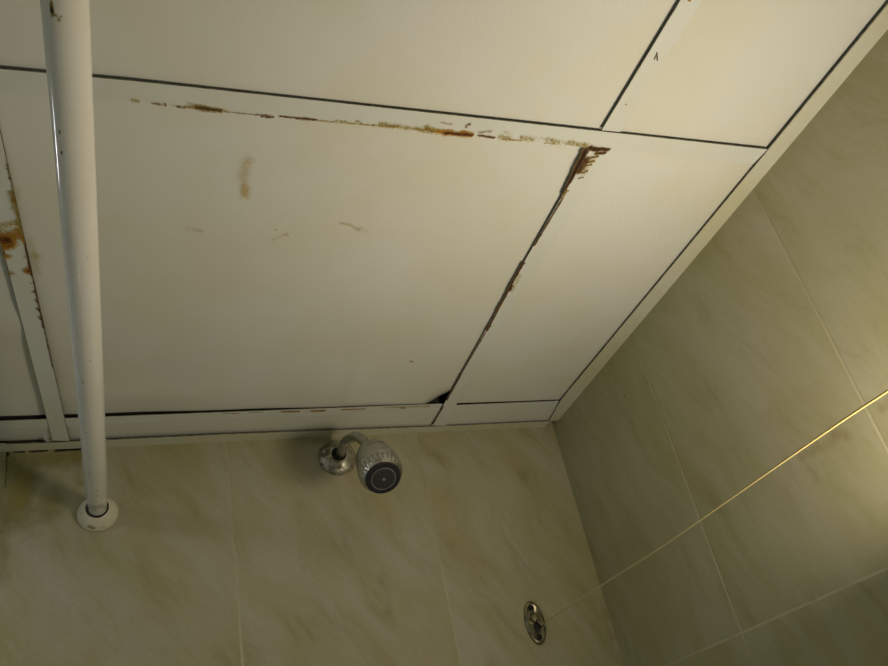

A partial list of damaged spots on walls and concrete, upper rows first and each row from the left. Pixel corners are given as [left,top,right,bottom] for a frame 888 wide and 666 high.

corrosion [0,160,53,368]
corrosion [152,103,534,141]
corrosion [433,262,525,424]
corrosion [534,139,611,246]